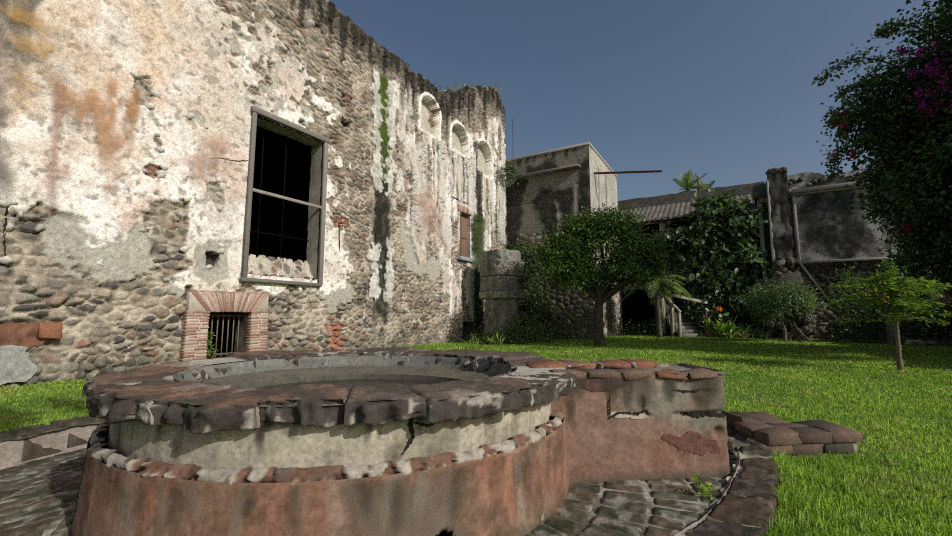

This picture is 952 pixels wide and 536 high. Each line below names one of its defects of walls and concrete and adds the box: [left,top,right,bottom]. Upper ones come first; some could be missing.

damp [0,0,40,55]
damp [291,0,591,323]
crack [1,197,9,256]
spalling [0,198,18,264]
spalling [138,196,192,282]
spalling [328,213,350,227]
peeling [0,321,63,349]
crack [401,418,436,455]